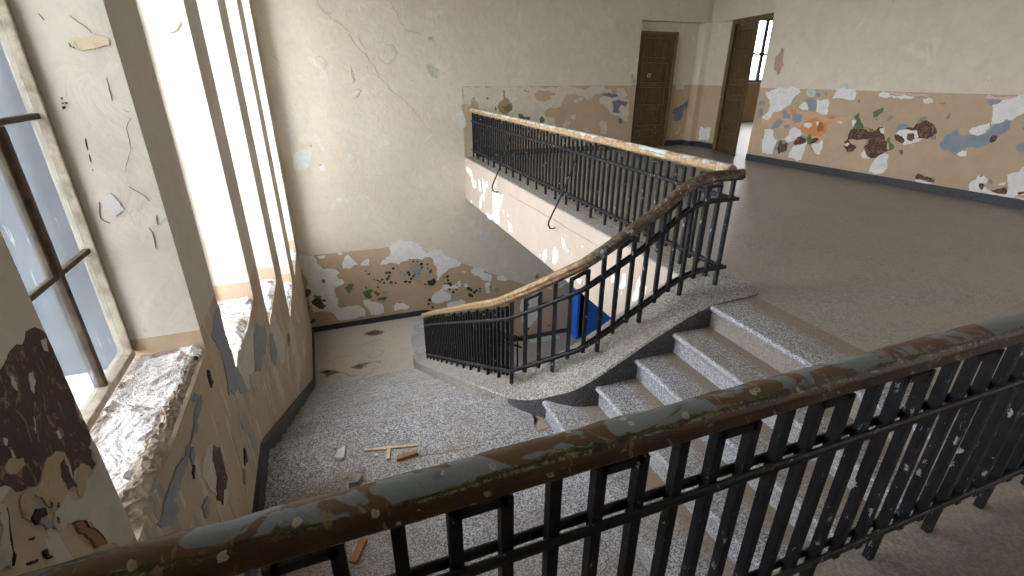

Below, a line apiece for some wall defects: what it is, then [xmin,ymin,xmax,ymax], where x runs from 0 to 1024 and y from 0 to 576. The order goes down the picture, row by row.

peeling [69,16,110,51]
peeling [456,84,629,134]
peeling [758,83,1024,174]
peeling [99,194,125,223]
crack [106,78,158,248]
peeling [292,145,326,171]
peeling [466,166,513,233]
peeling [915,173,935,184]
peeling [969,167,1024,200]
peeling [539,235,587,265]
peeling [0,239,508,548]
peeling [26,549,53,566]